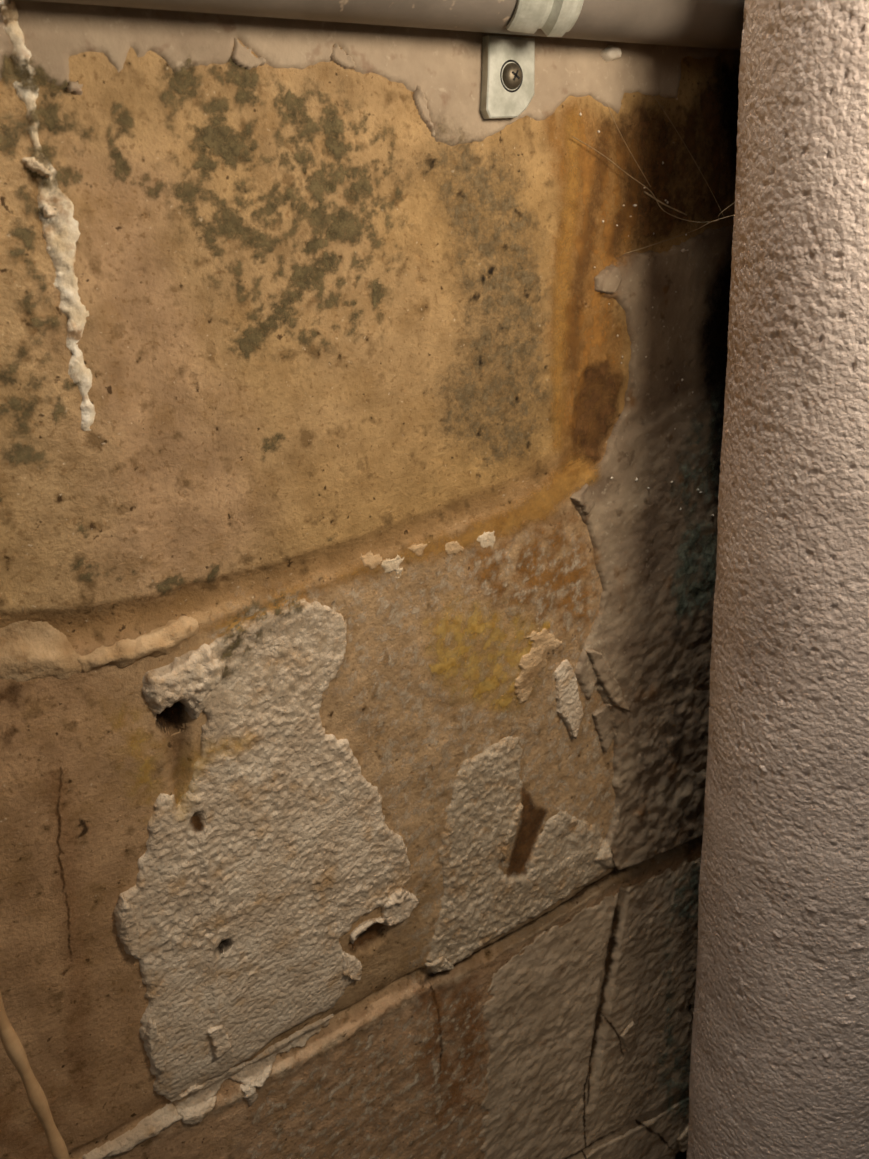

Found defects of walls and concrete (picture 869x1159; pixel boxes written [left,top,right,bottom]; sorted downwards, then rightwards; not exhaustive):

mould [0,228,59,468]
mould [0,56,92,217]
mould [53,379,80,422]
mould [108,104,134,181]
mould [142,57,402,358]
peeling [0,0,718,431]
mould [428,135,549,462]
spalling [142,643,225,773]
spalling [191,813,203,831]
spalling [349,923,384,949]
crack [419,849,672,1159]
peeling [477,226,733,1159]